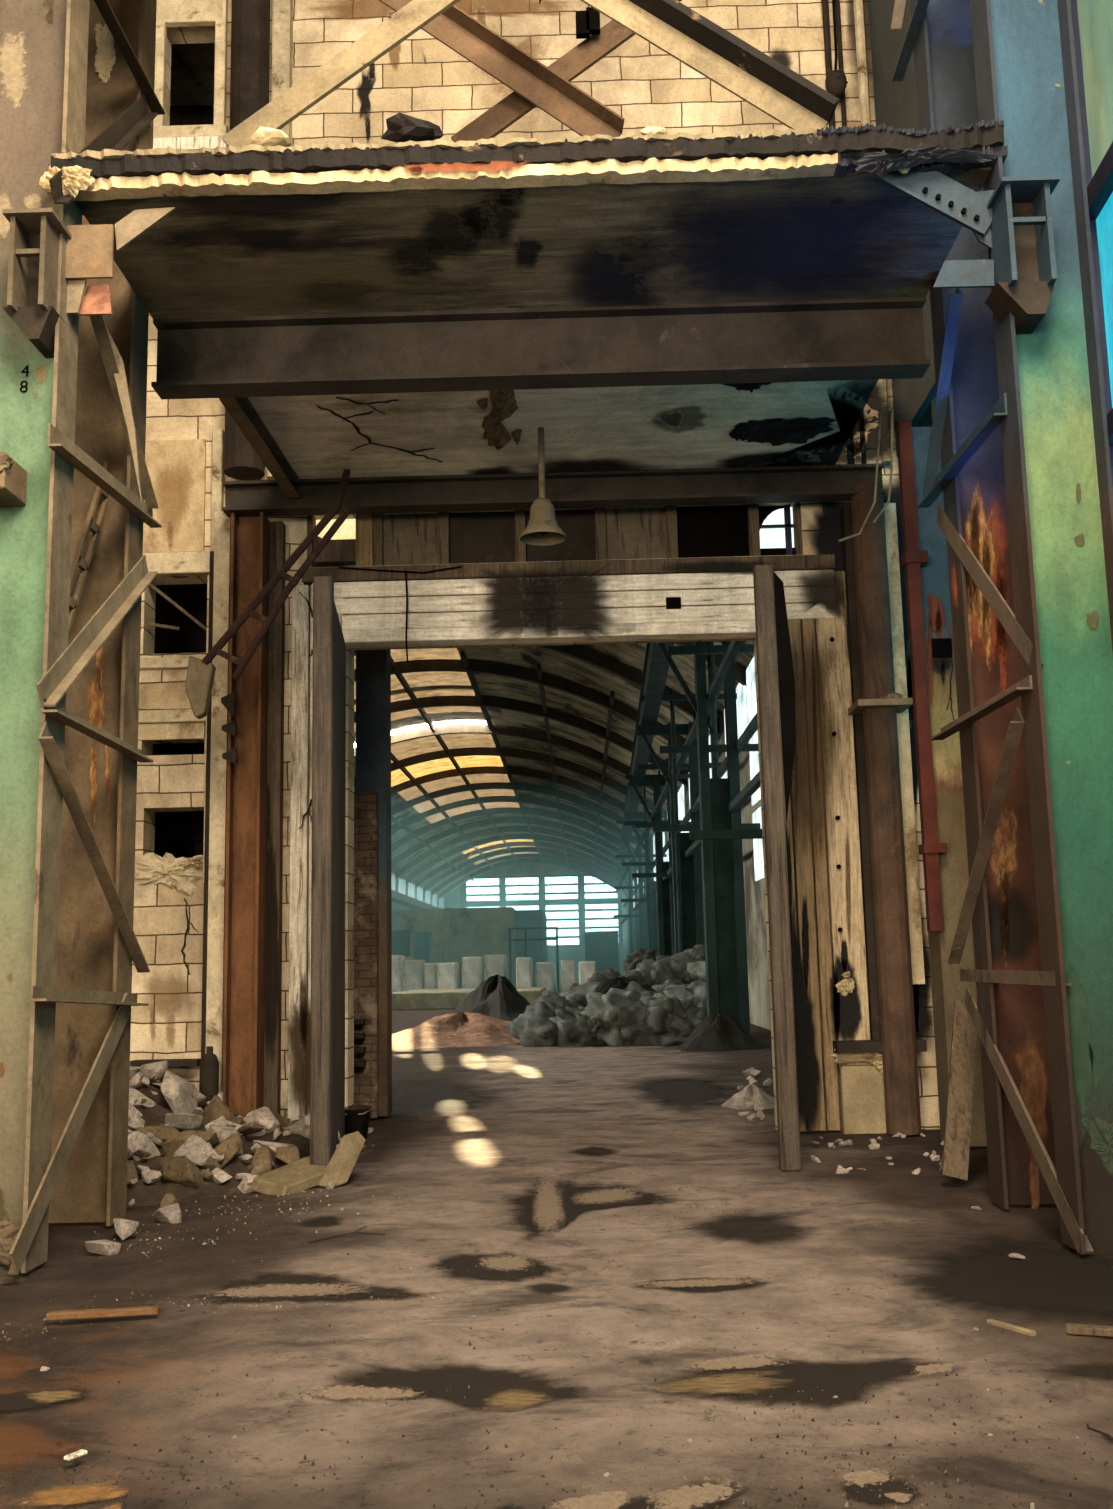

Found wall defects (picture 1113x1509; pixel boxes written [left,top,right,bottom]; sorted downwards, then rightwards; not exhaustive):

peeling [0,36,26,106]
water stain [494,188,525,205]
water stain [515,238,543,265]
water stain [575,239,654,306]
crack [317,397,442,463]
spalling [477,390,522,450]
rust [928,491,1009,703]
rust [990,810,1019,958]